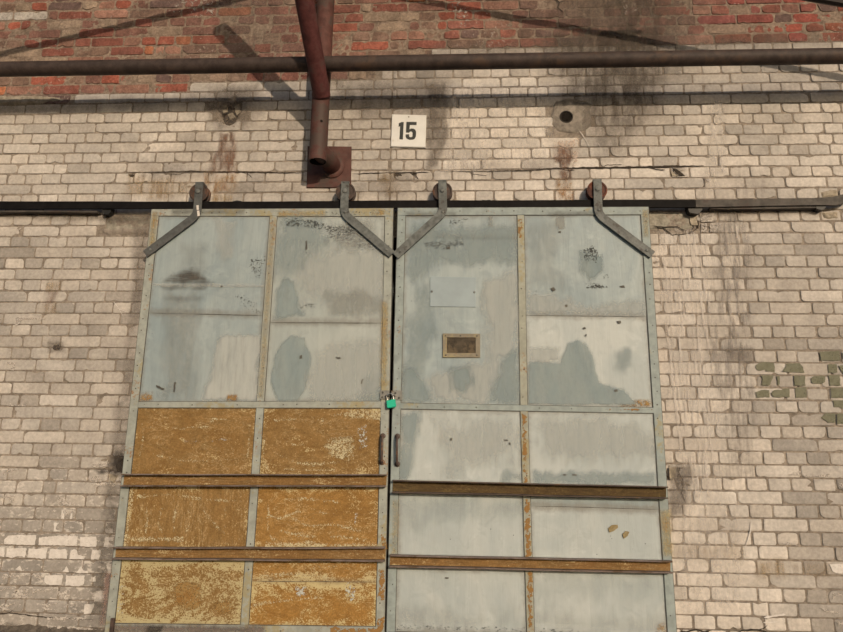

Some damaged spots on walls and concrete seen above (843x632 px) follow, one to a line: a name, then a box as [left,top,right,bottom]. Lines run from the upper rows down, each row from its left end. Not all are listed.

corrosion [206,134,235,201]
corrosion [556,141,577,200]
peeling [0,497,114,630]
peeling [830,564,843,574]